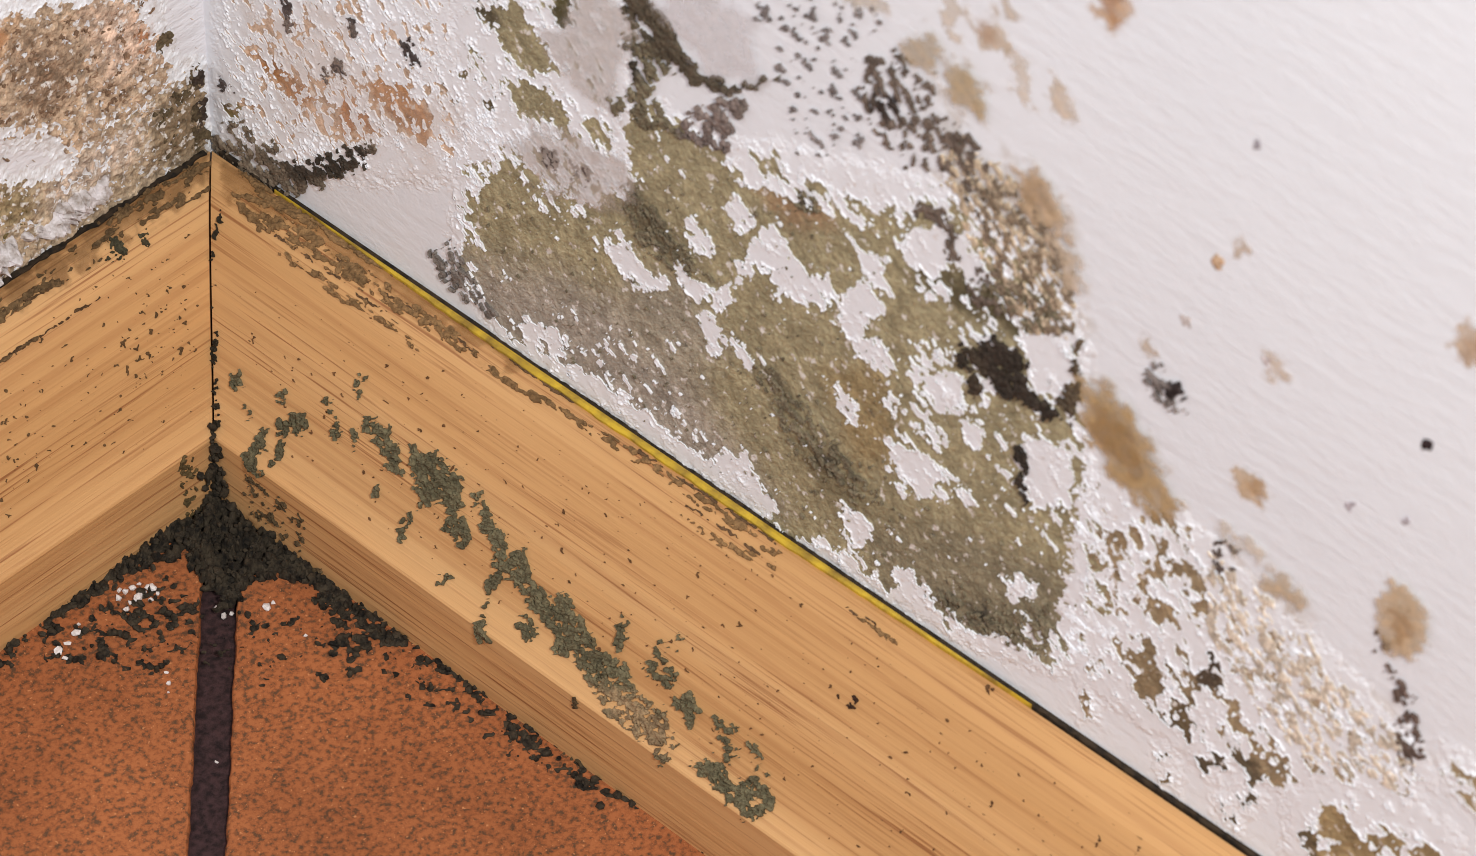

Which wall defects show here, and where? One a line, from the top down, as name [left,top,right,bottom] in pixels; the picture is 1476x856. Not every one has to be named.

leakage [0,1,174,125]
leakage [280,0,294,34]
leakage [318,57,347,85]
leakage [346,17,359,39]
leakage [399,36,422,68]
leakage [753,0,1189,520]
leakage [528,134,930,535]
leakage [0,62,814,823]
leakage [822,668,875,709]
leakage [849,617,898,673]
leakage [925,534,1058,655]
leakage [1197,524,1427,791]